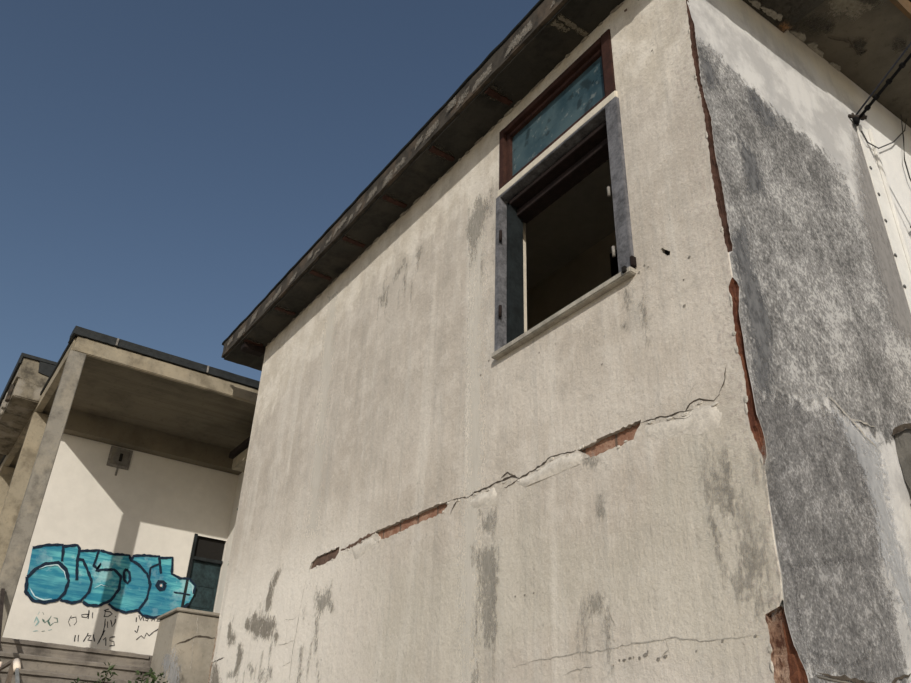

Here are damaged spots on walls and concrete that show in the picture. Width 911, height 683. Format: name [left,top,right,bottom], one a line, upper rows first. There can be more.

spalling [748,0,783,21]
leakage [696,38,911,683]
leakage [459,198,498,683]
crack [829,397,911,445]
crack [450,451,574,514]
crack [341,532,375,551]
leakage [209,623,272,683]
leakage [245,568,281,640]
leakage [314,585,333,652]
crack [510,609,759,675]
spalling [765,606,808,683]